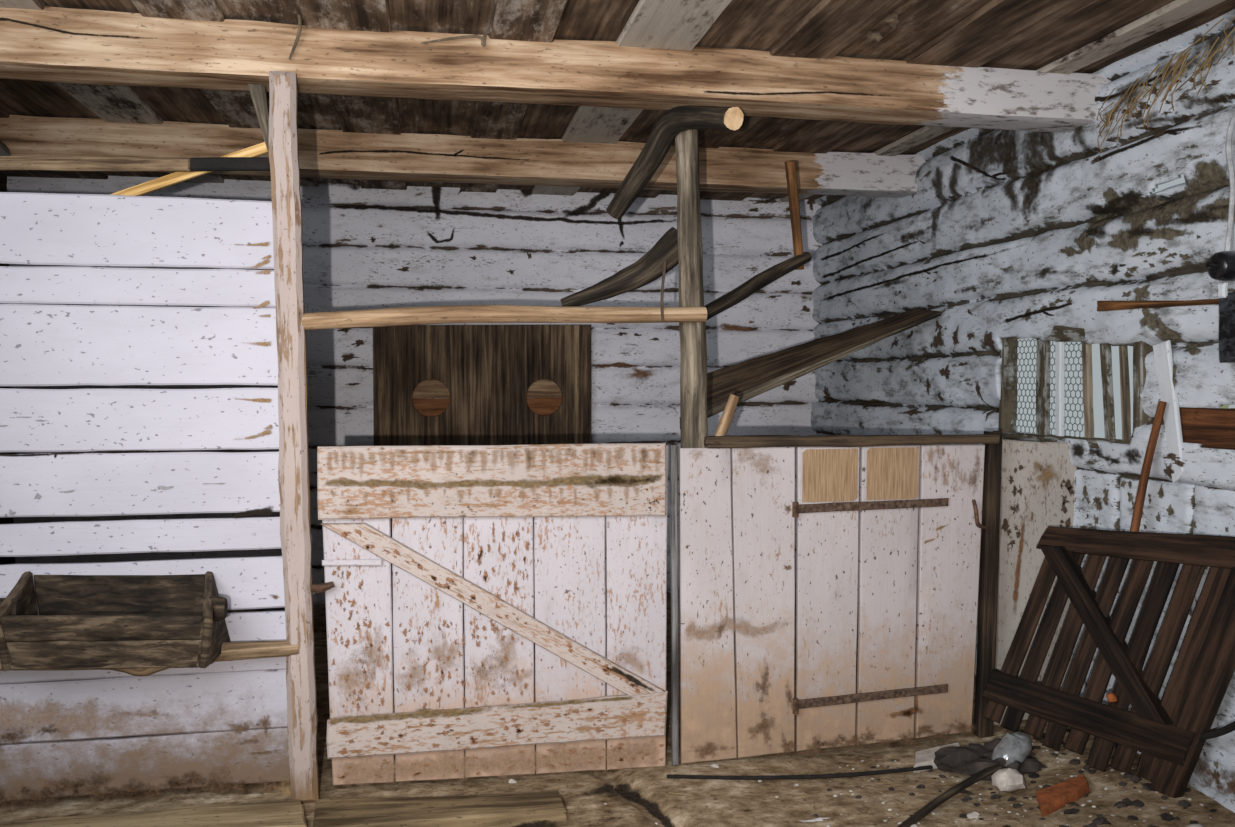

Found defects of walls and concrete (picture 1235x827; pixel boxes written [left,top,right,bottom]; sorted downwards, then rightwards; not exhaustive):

crack [0,17,139,39]
peeling [1060,160,1235,355]
peeling [1023,289,1075,321]
peeling [914,320,1000,402]
peeling [854,400,885,409]